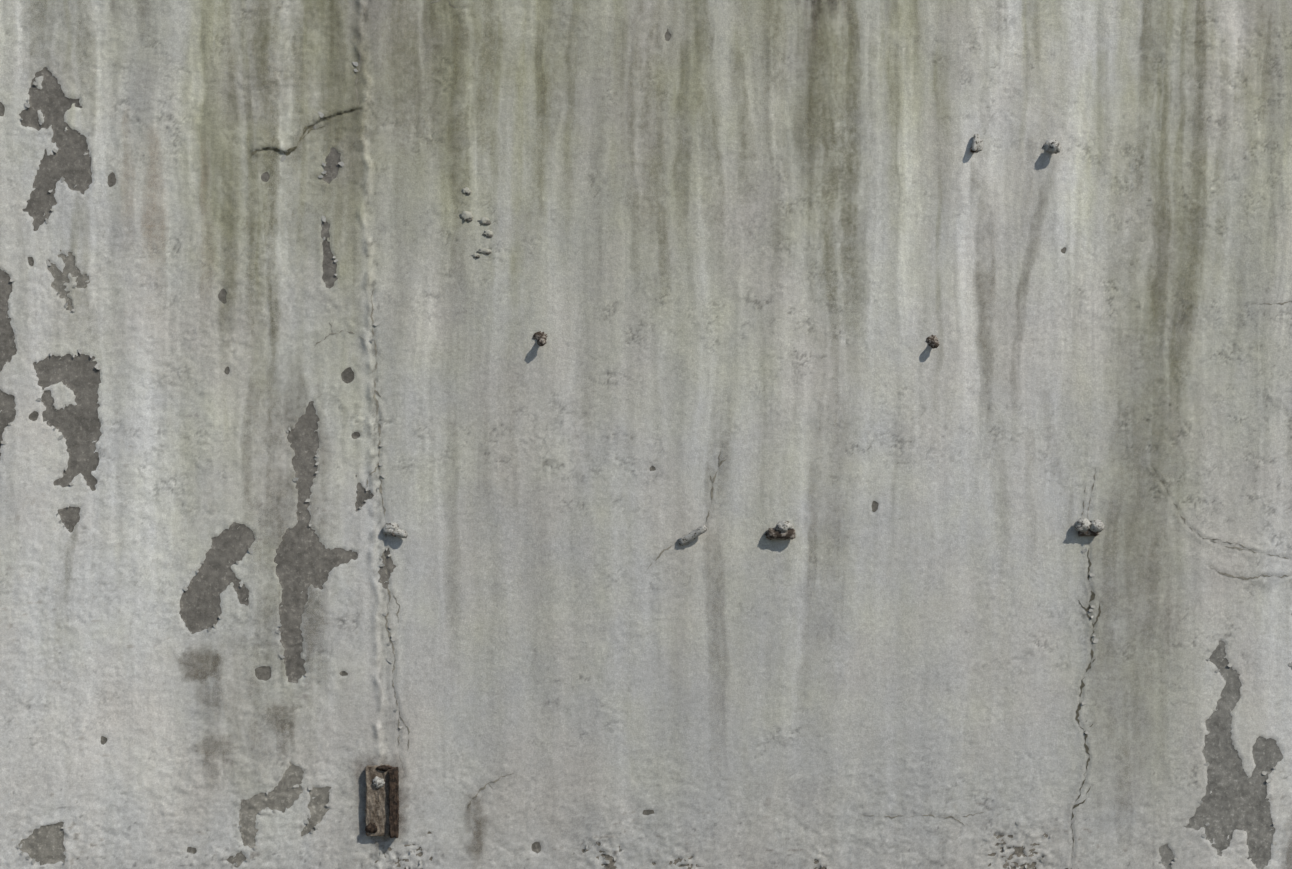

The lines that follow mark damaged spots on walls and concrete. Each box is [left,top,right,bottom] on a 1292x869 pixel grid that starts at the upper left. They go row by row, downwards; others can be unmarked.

peeling [0,67,92,231]
crack [251,5,368,162]
peeling [0,269,17,372]
peeling [28,250,90,312]
peeling [0,349,102,491]
peeling [179,522,255,634]
peeling [255,401,358,683]
crack [1153,467,1290,580]
peeling [16,822,66,866]
peeling [226,761,331,868]
crack [1071,548,1101,843]
peeling [1184,640,1283,869]